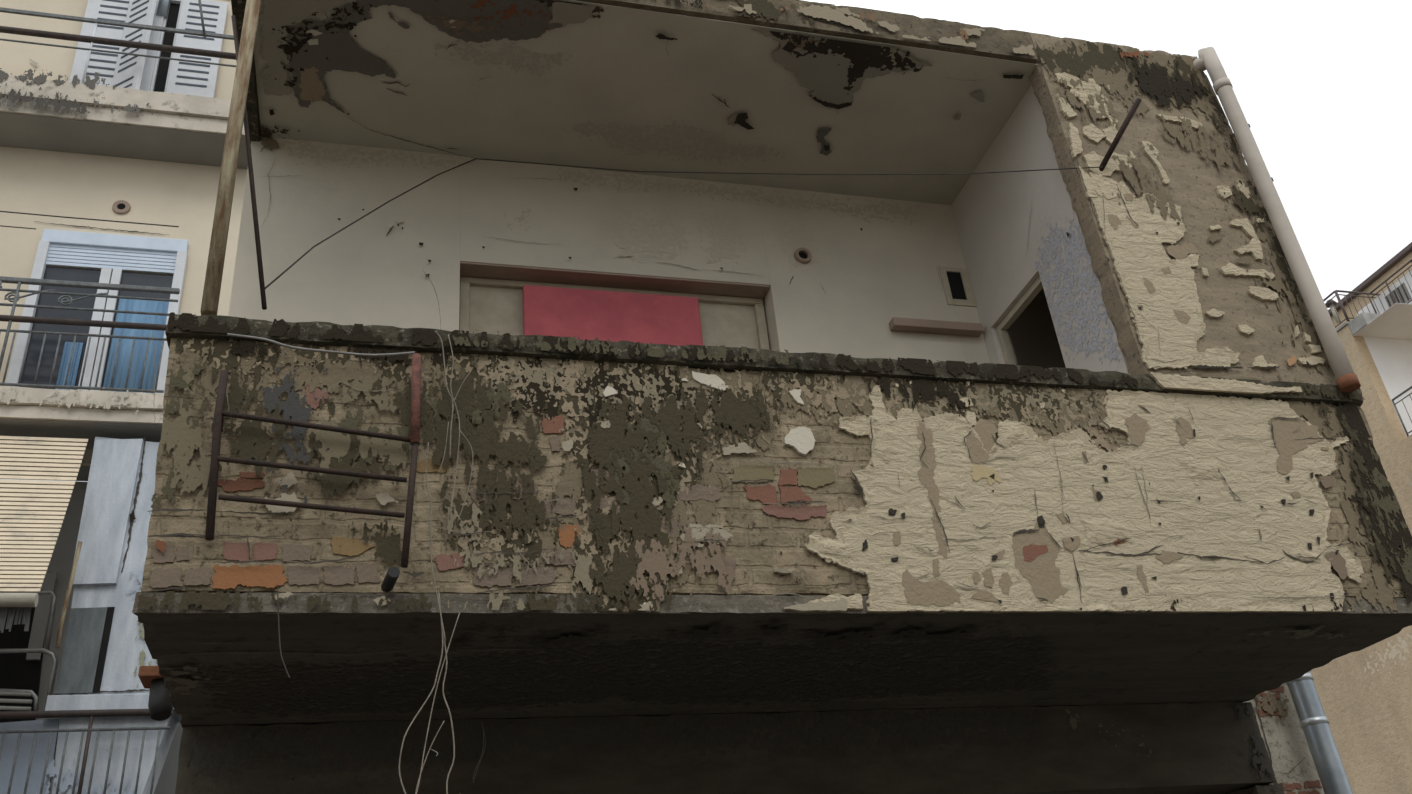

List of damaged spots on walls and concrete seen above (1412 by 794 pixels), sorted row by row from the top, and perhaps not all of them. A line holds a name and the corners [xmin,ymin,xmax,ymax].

mould [0,68,157,118]
peeling [258,0,594,115]
spalling [728,112,754,130]
spalling [816,128,832,156]
spalling [751,28,933,109]
damp [1035,38,1239,156]
damp [0,387,145,419]
flaking render [149,544,287,590]
damp [129,312,1144,611]
peeling [888,419,1080,606]
crack [722,310,1361,603]
damp [1215,179,1412,603]